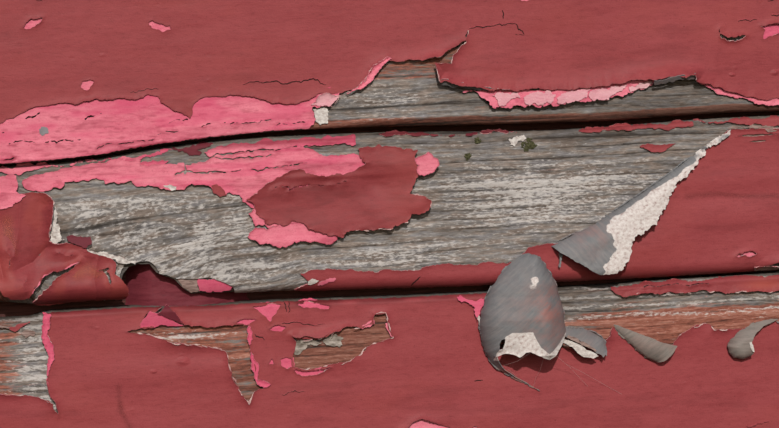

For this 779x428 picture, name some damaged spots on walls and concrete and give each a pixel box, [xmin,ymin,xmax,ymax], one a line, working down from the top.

peeling [763,24,779,39]
peeling [0,41,779,164]
peeling [0,115,779,413]
peeling [408,419,449,428]